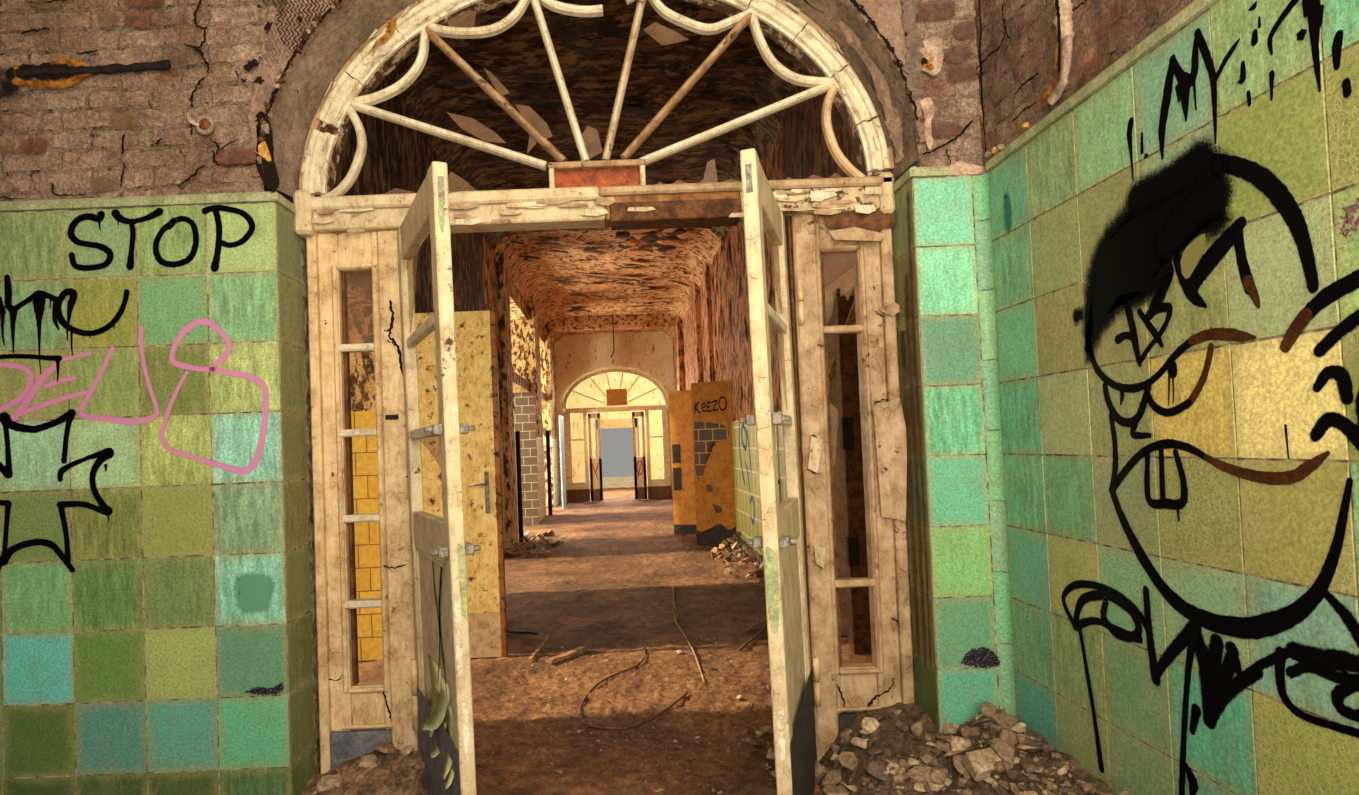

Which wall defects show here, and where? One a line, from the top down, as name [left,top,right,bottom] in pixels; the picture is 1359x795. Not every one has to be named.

crack [0,0,67,56]
crack [120,0,257,187]
flaking render [241,0,342,193]
crack [922,0,1038,164]
crack [0,183,86,200]
flaking render [301,0,978,410]
crack [387,300,403,375]
peeling [808,436,822,473]
peeling [873,398,907,521]
peeling [814,546,826,568]